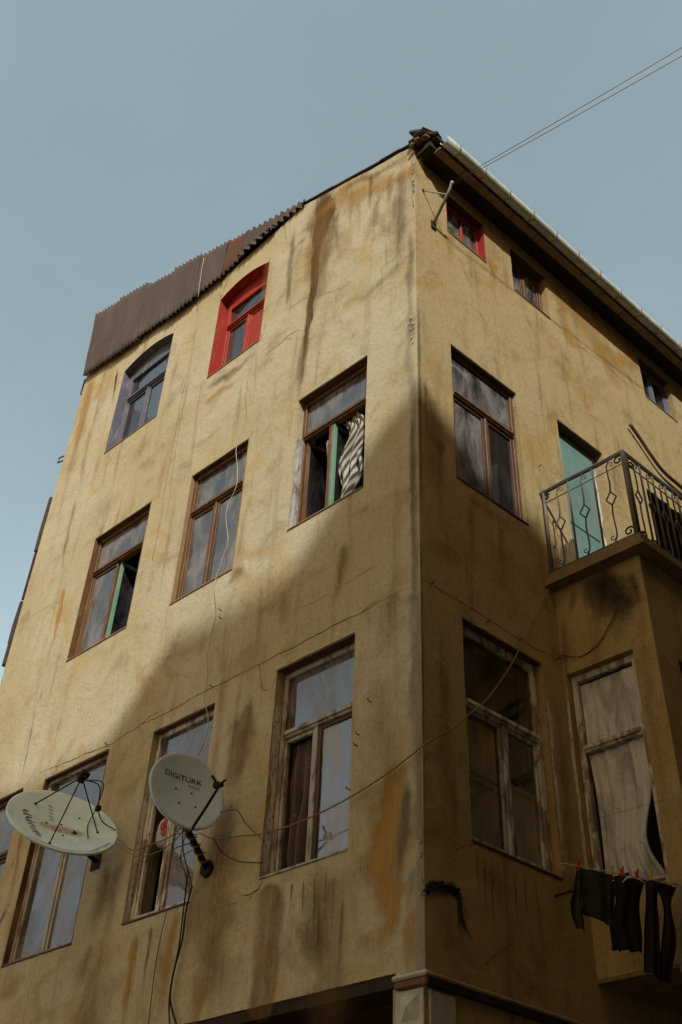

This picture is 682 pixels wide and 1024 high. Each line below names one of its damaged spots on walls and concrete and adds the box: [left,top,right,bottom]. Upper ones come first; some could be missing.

water stain [299,195,335,364]
rust [365,767,414,953]